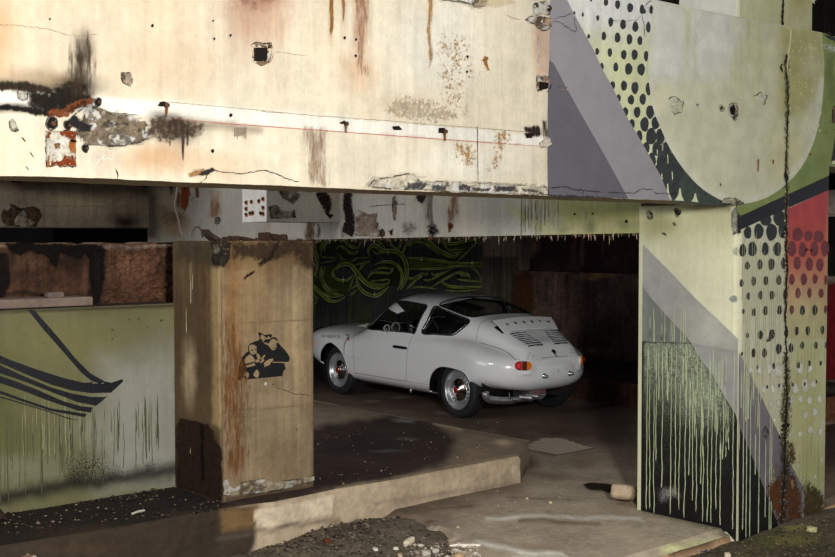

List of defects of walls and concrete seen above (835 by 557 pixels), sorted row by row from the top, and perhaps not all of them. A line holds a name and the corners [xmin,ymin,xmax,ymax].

corrosion [329,0,345,33]
corrosion [427,0,472,107]
spalling [525,1,568,93]
flaking render [1,204,41,227]
corrosion [46,130,77,167]
spalling [45,105,151,168]
crack [189,168,298,191]
spalling [369,173,549,221]
crack [780,0,792,525]
corrosion [222,325,248,470]
leakage [176,418,223,501]
spalling [222,475,316,496]